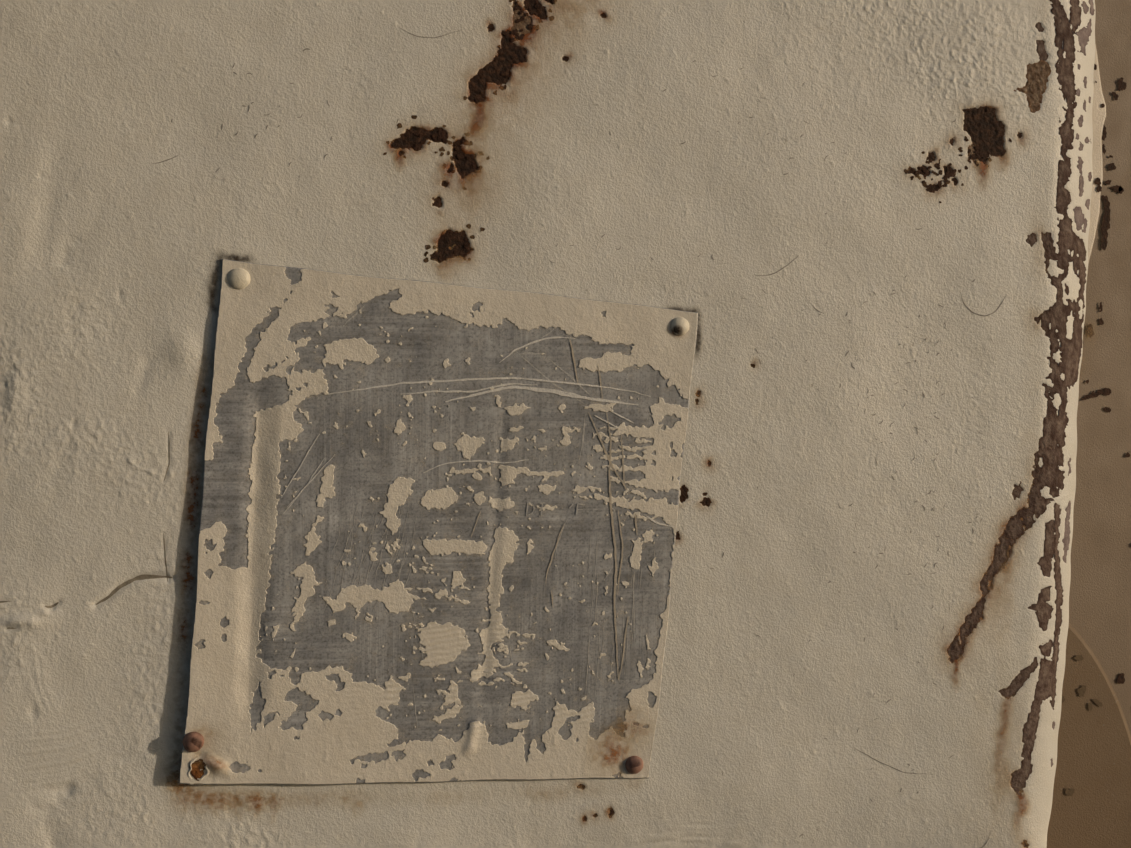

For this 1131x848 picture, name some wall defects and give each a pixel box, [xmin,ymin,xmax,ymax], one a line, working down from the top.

corrosion [423,224,485,264]
corrosion [383,0,557,208]
corrosion [904,105,1023,203]
peeling [179,260,698,784]